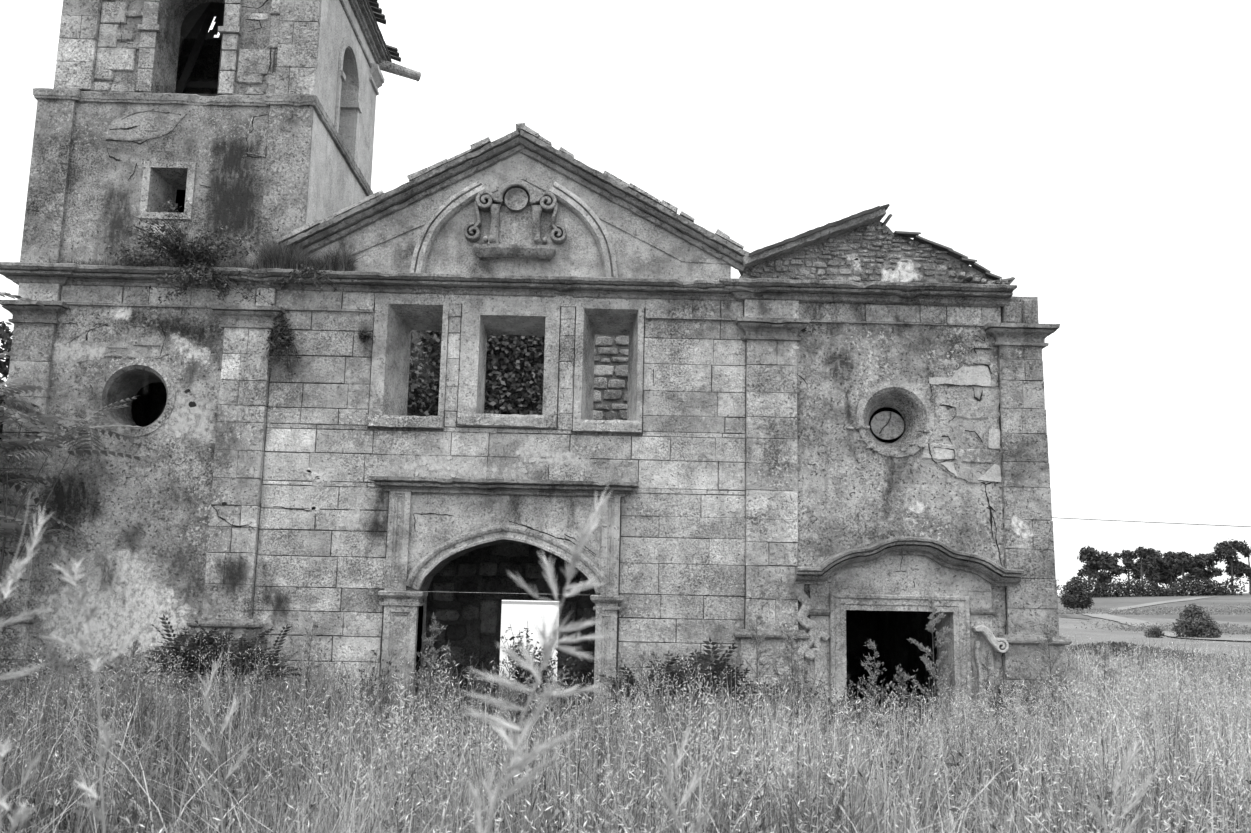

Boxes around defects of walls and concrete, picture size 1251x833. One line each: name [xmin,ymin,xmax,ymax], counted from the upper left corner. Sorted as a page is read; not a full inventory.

leakage [208,139,259,239]
spalling [923,337,1002,484]
leakage [43,473,101,525]
crack [981,482,1003,566]